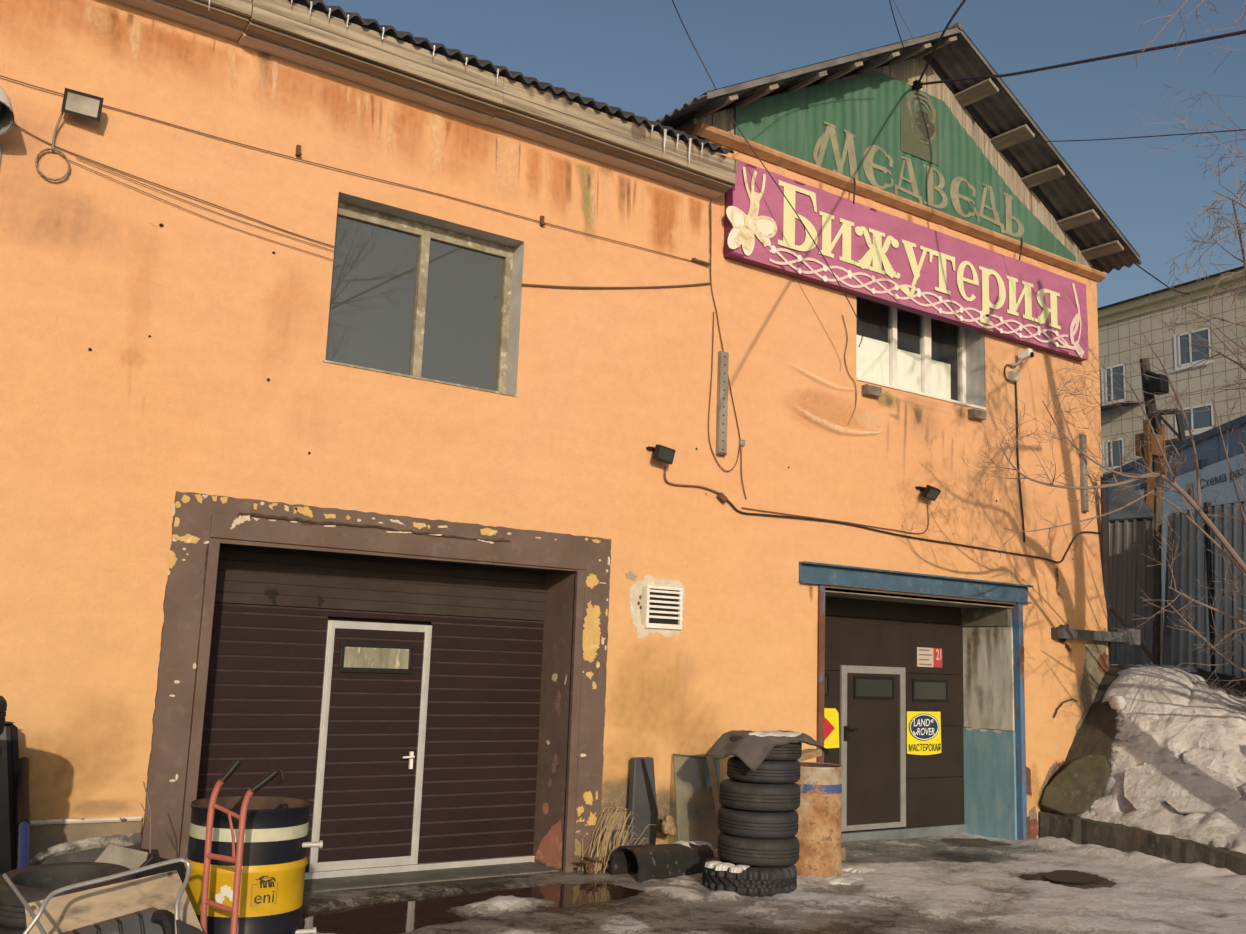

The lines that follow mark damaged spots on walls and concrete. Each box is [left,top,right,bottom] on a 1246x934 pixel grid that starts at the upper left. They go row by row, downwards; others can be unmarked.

water stain [430,114,443,165]
water stain [580,166,594,220]
peeling [167,494,228,575]
peeling [230,502,447,536]
peeling [477,528,511,544]
peeling [582,557,610,689]
peeling [625,571,685,639]
peeling [552,674,567,717]
spalling [535,791,598,869]